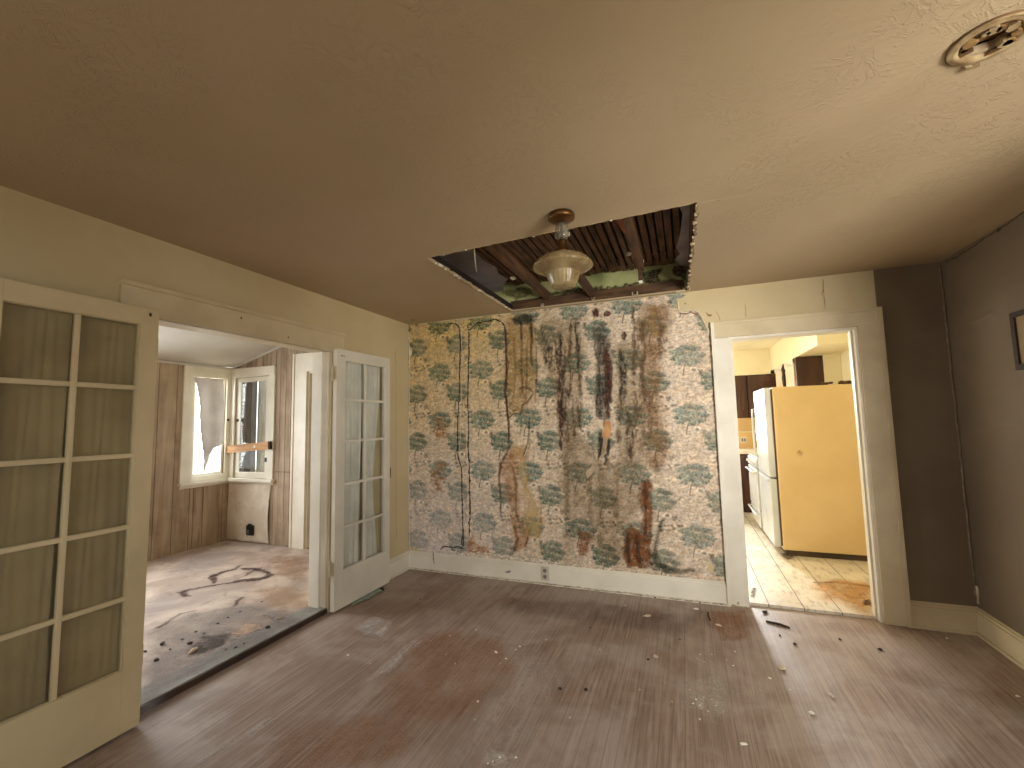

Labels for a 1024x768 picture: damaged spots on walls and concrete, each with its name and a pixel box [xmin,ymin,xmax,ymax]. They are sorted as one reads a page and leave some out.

peeling [427,203,699,311]
damp [498,314,539,550]
damp [545,323,581,450]
damp [592,307,667,466]